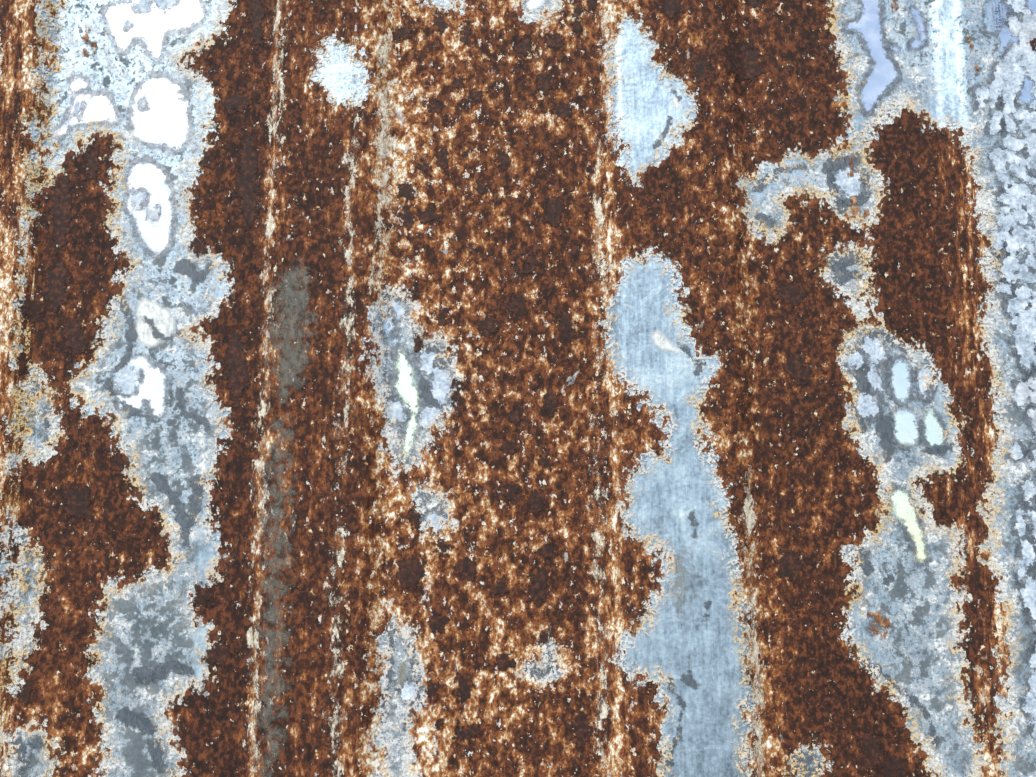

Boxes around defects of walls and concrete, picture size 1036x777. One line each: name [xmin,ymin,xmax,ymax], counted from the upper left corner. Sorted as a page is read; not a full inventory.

peeling [841,0,928,116]
corrosion [879,0,937,45]
corrosion [891,39,938,97]
peeling [979,0,1036,64]
peeling [50,0,209,259]